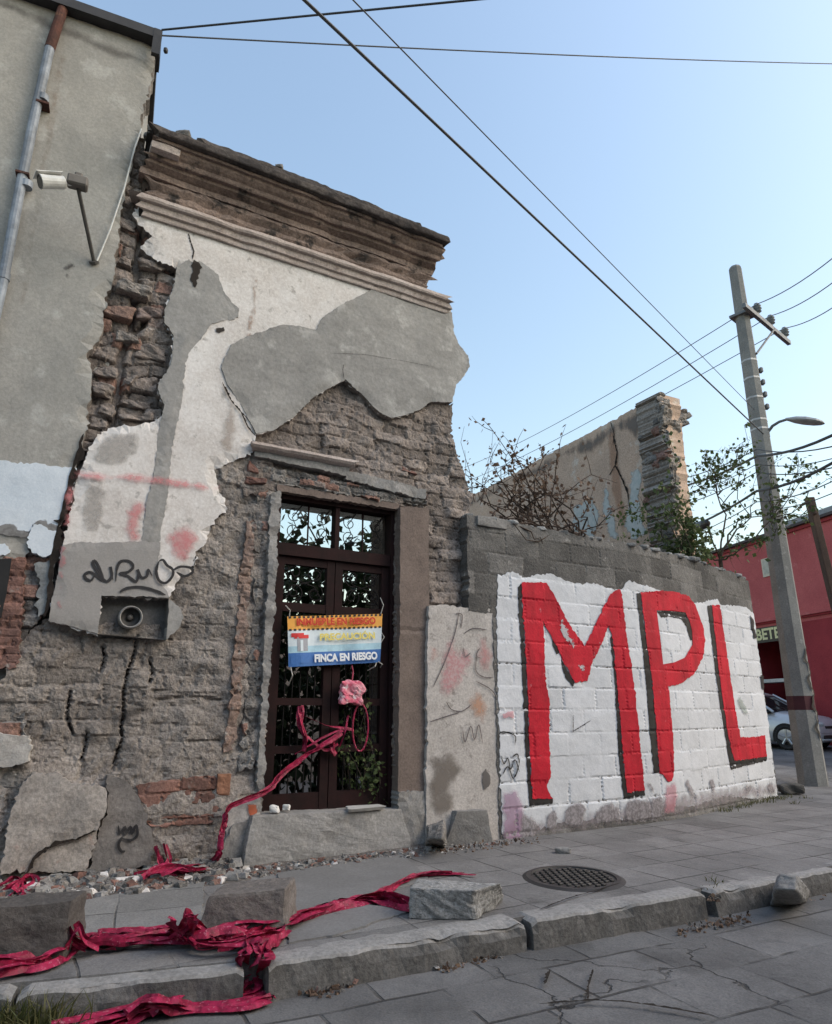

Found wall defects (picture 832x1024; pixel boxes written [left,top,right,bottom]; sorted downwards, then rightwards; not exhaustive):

spalling [77,138,175,467]
crack [609,422,631,509]
spalling [0,383,474,882]
crack [66,695,88,759]
crack [100,645,153,763]
crack [539,969,714,1016]